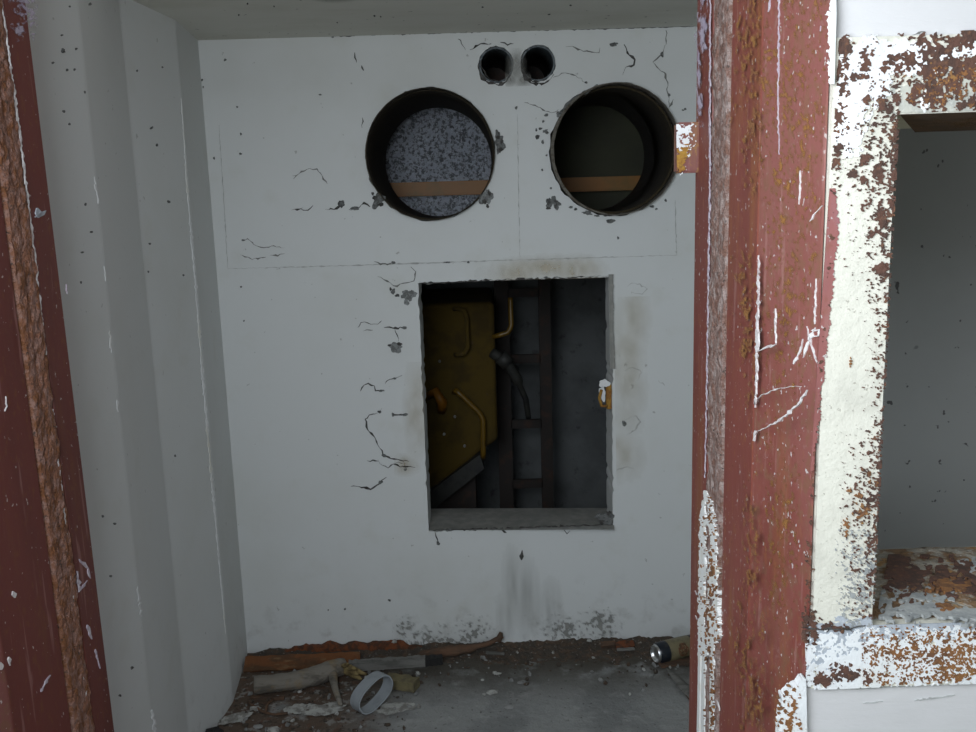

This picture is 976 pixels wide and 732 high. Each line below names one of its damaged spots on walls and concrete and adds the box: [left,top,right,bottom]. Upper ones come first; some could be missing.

crack [434,31,516,50]
crack [543,26,694,107]
spalling [495,130,506,154]
spalling [535,84,598,156]
crack [219,102,677,287]
spalling [479,189,494,208]
crack [358,321,407,341]
rust [730,0,976,688]
crack [351,375,415,490]
rust [285,640,422,653]
rust [734,628,802,732]